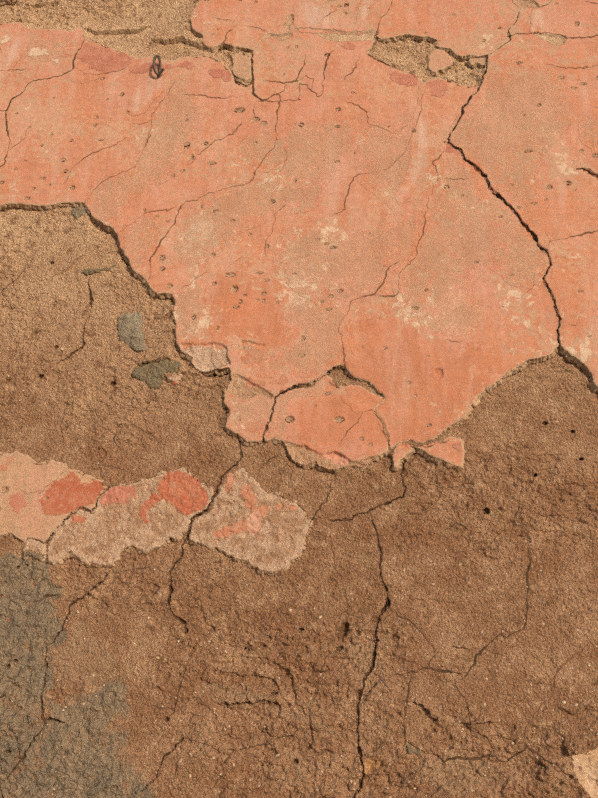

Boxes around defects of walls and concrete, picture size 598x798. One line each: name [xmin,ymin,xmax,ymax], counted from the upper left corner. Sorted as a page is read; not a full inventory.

crack [0,33,131,167]
crack [59,288,92,362]
crack [66,0,393,278]
peeling [0,0,598,473]
crack [262,0,598,447]
crack [2,578,105,798]
crack [46,487,109,543]
spalling [0,479,313,577]
crack [136,434,242,732]
spalling [336,621,350,651]
crack [307,462,586,798]
spalling [572,747,598,798]